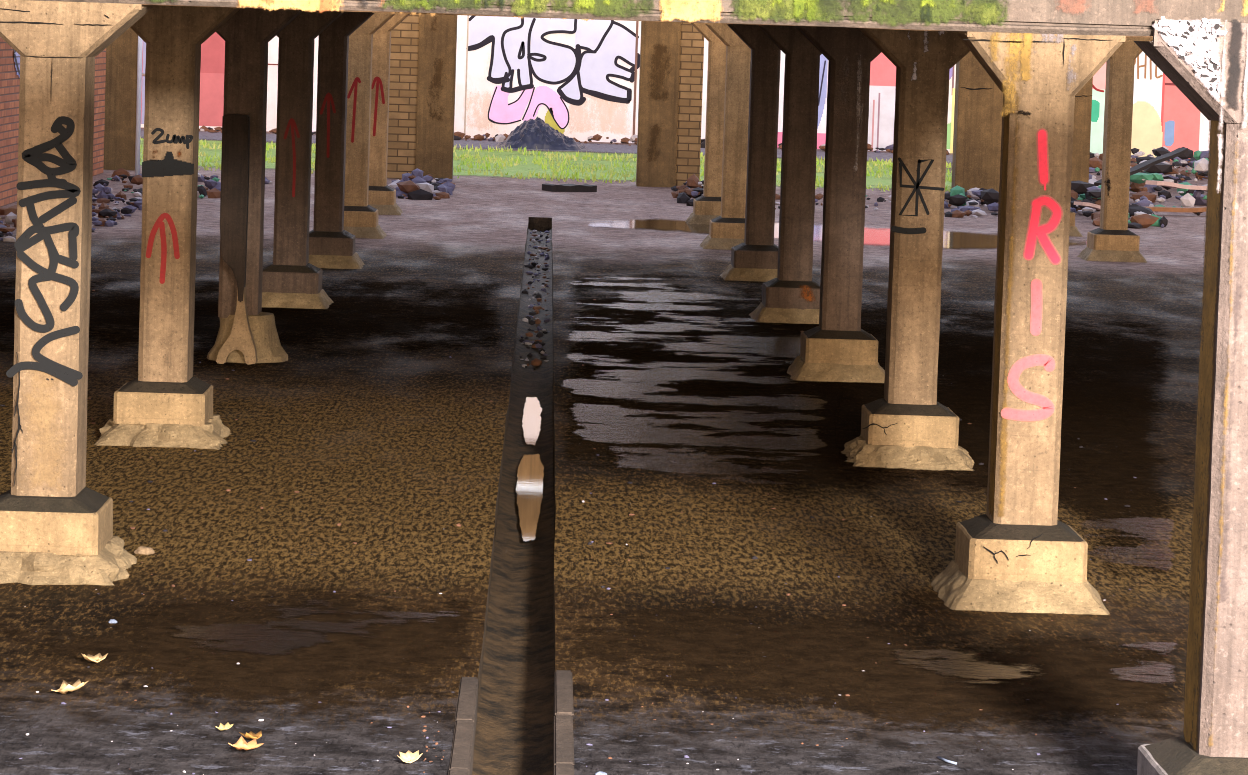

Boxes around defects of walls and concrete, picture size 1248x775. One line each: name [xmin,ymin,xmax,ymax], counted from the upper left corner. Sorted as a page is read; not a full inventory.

corrosion [239,0,342,12]
corrosion [660,0,721,22]
peeling [1153,16,1227,100]
damp [564,30,1076,519]
crack [11,352,23,486]
damp [1058,314,1169,573]
damp [1183,0,1248,751]
crack [983,534,1042,564]
damp [571,603,1169,732]